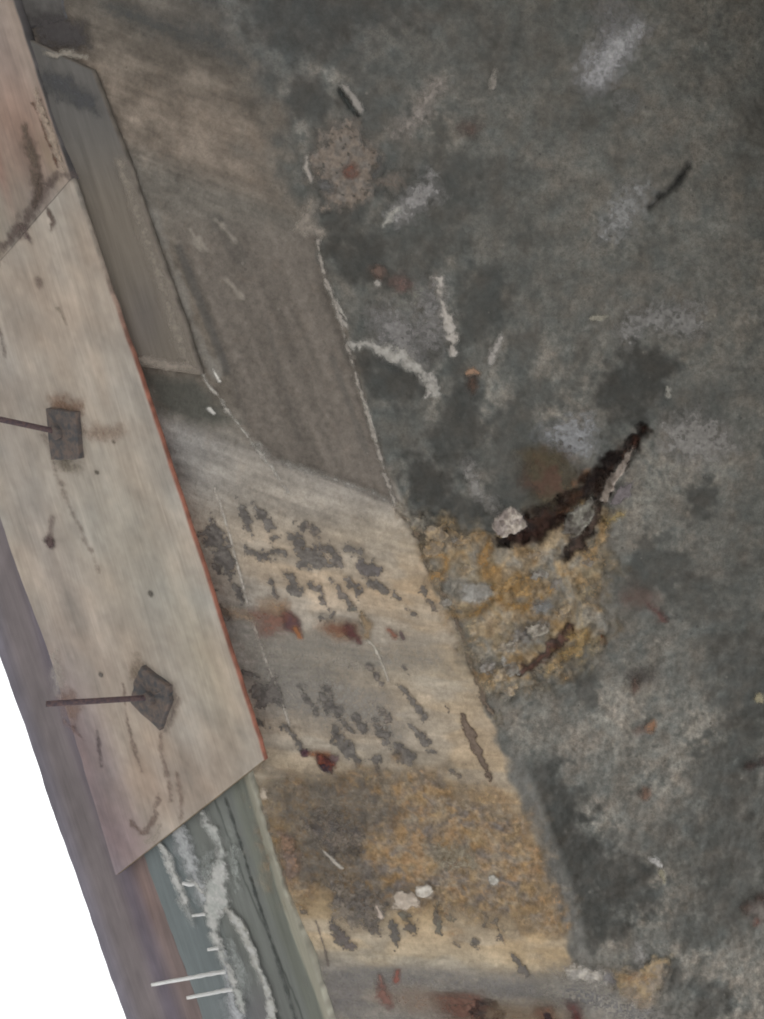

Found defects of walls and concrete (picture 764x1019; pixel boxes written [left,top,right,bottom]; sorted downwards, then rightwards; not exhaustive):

peeling [197,497,417,626]
crack [202,239,494,782]
spalling [400,424,647,702]
efflorescence [157,812,277,1019]
corrosion [375,970,582,1019]